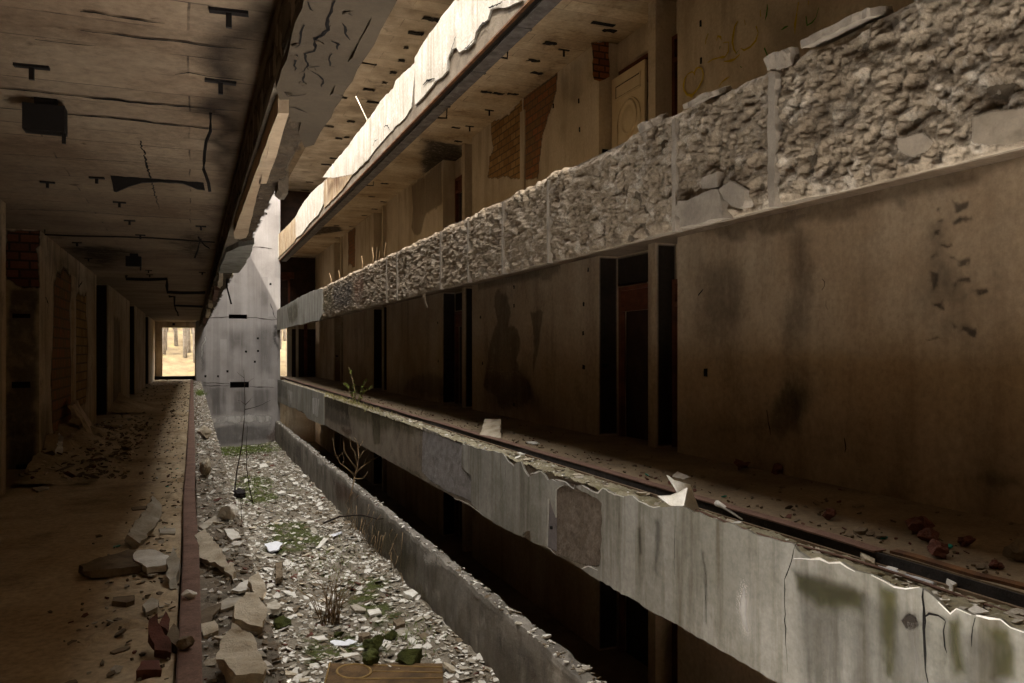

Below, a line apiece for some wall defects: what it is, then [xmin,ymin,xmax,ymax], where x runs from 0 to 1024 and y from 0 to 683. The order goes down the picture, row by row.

crack [284,0,353,113]
flaking render [591,42,610,81]
crack [0,88,235,207]
spalling [201,0,301,326]
flaking render [488,73,557,180]
flaking render [6,229,40,288]
spalling [275,411,602,683]
spalling [503,453,660,570]
crack [784,543,797,670]
crack [921,589,975,683]